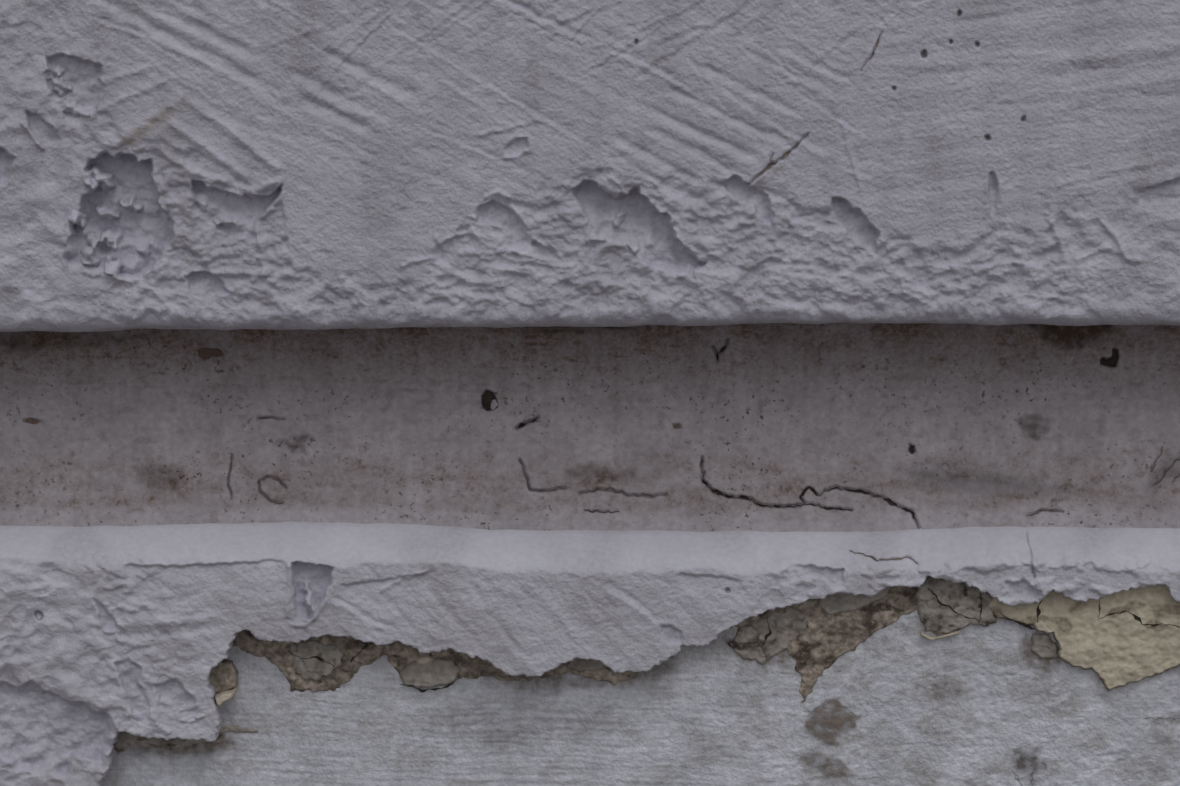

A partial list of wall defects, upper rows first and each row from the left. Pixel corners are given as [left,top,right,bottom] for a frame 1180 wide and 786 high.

crack [519,459,667,513]
crack [700,459,920,529]
crack [849,550,918,564]
peeling [0,565,1180,786]